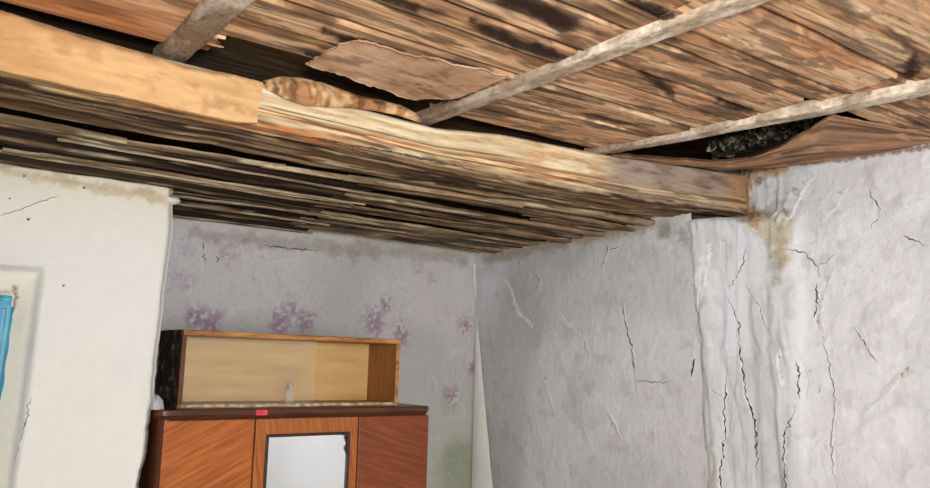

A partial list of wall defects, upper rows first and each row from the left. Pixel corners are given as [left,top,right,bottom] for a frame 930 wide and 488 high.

water stain [495,0,570,31]
crack [622,301,669,394]
crack [691,248,838,488]
crack [14,398,32,464]